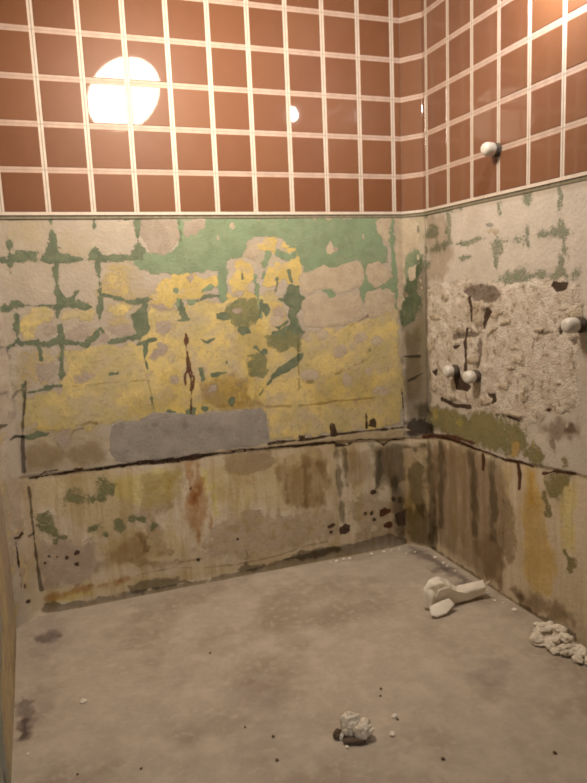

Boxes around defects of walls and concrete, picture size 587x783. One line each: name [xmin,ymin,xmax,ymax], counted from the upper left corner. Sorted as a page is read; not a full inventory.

crack [28,390,404,480]
damp [132,466,394,570]
peeling [0,185,585,783]
crack [422,433,576,490]